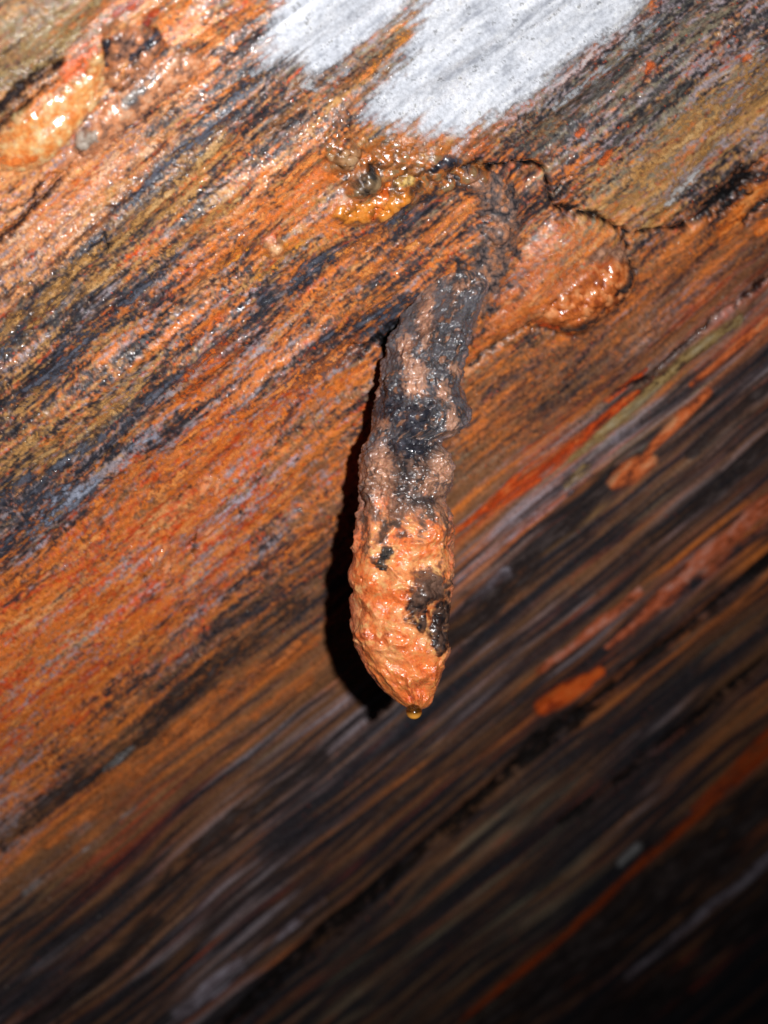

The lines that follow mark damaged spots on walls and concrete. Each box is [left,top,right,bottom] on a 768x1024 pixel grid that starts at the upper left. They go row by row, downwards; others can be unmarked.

rust [167,18,238,73]
rust [0,87,195,311]
rust [196,154,412,282]
water stain [0,0,707,360]
rust [320,207,472,303]
crack [450,159,768,270]
rust [716,183,763,241]
rust [0,340,368,600]
rust [454,368,647,535]
rust [609,316,768,489]
rust [537,495,768,672]
rust [535,667,605,714]